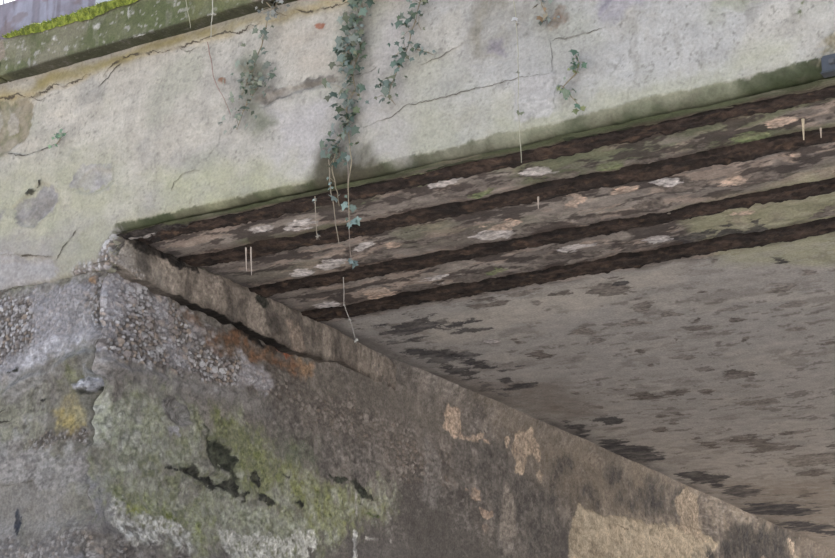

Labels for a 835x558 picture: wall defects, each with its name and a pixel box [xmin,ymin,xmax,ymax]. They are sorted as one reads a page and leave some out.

crack [0,21,260,105]
crack [364,28,602,128]
peeling [516,165,582,181]
peeling [592,116,799,172]
peeling [609,152,815,212]
peeling [247,218,320,234]
peeling [288,193,604,277]
peeling [357,243,604,300]
peeling [616,209,769,250]
rust [176,303,317,384]
peeling [351,276,715,397]
water stain [418,420,835,558]